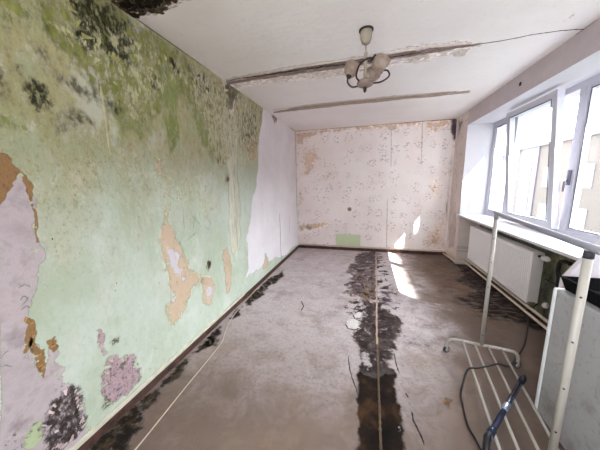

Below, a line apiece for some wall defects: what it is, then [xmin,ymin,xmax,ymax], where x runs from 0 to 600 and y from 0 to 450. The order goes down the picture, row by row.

damp [68,0,138,65]
flaking render [110,0,178,19]
crack [226,19,598,87]
damp [23,78,53,112]
damp [57,76,97,102]
crack [274,91,470,113]
peeling [0,153,91,450]
peeling [158,203,215,325]
peeling [222,248,232,293]
flaking render [100,353,141,409]
damp [344,252,429,450]
damp [29,384,88,450]